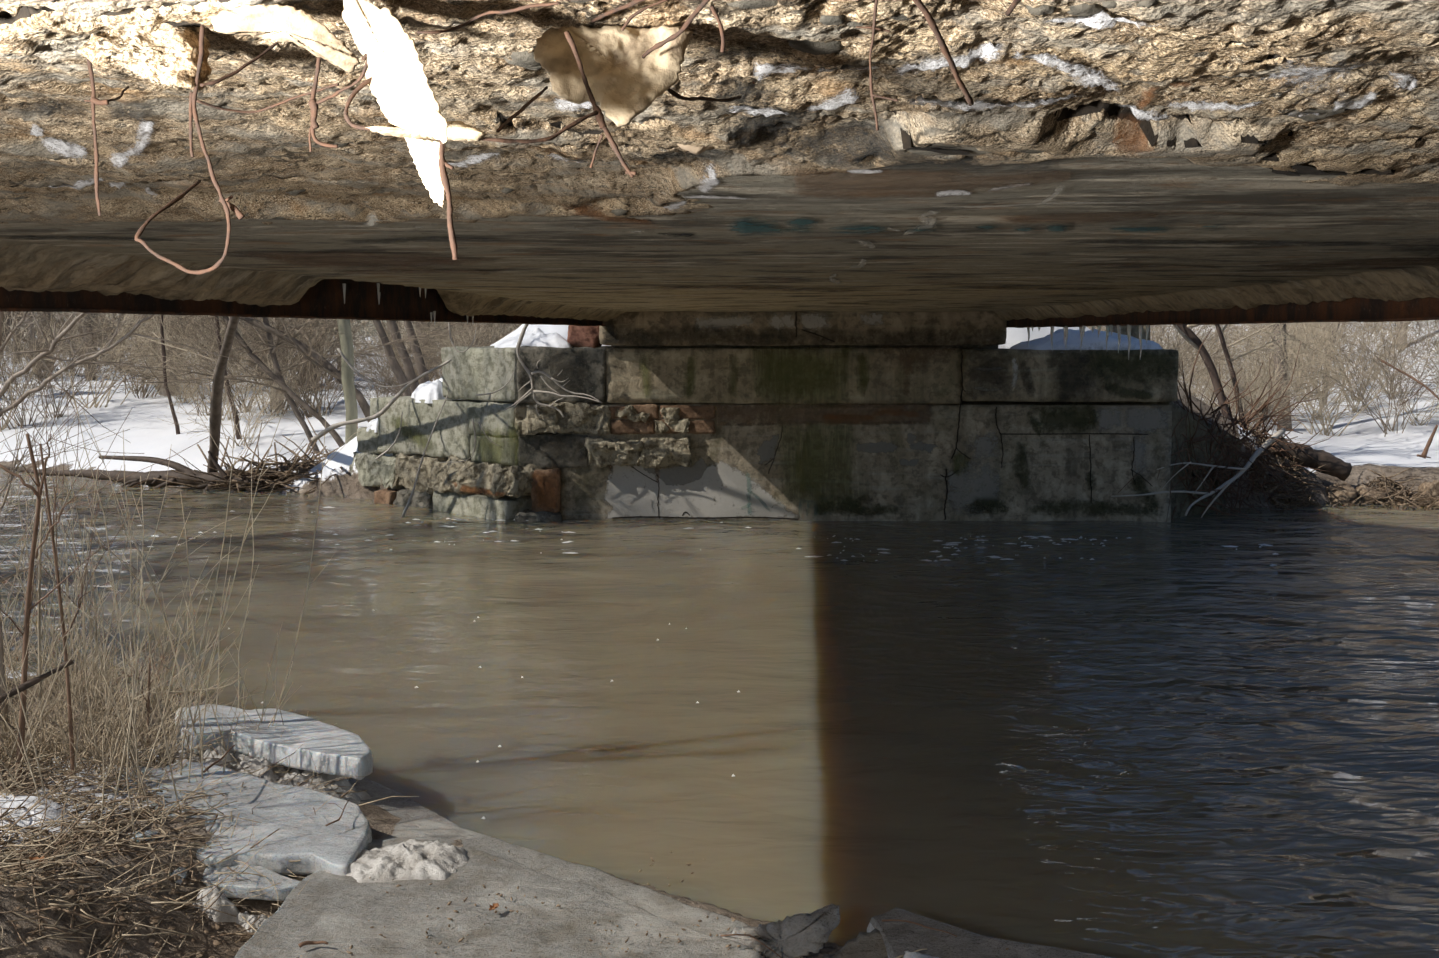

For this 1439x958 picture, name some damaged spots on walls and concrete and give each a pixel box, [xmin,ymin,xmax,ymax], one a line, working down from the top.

damp [18,100,87,158]
damp [49,103,153,190]
spalling [0,0,1439,275]
damp [630,41,1130,210]